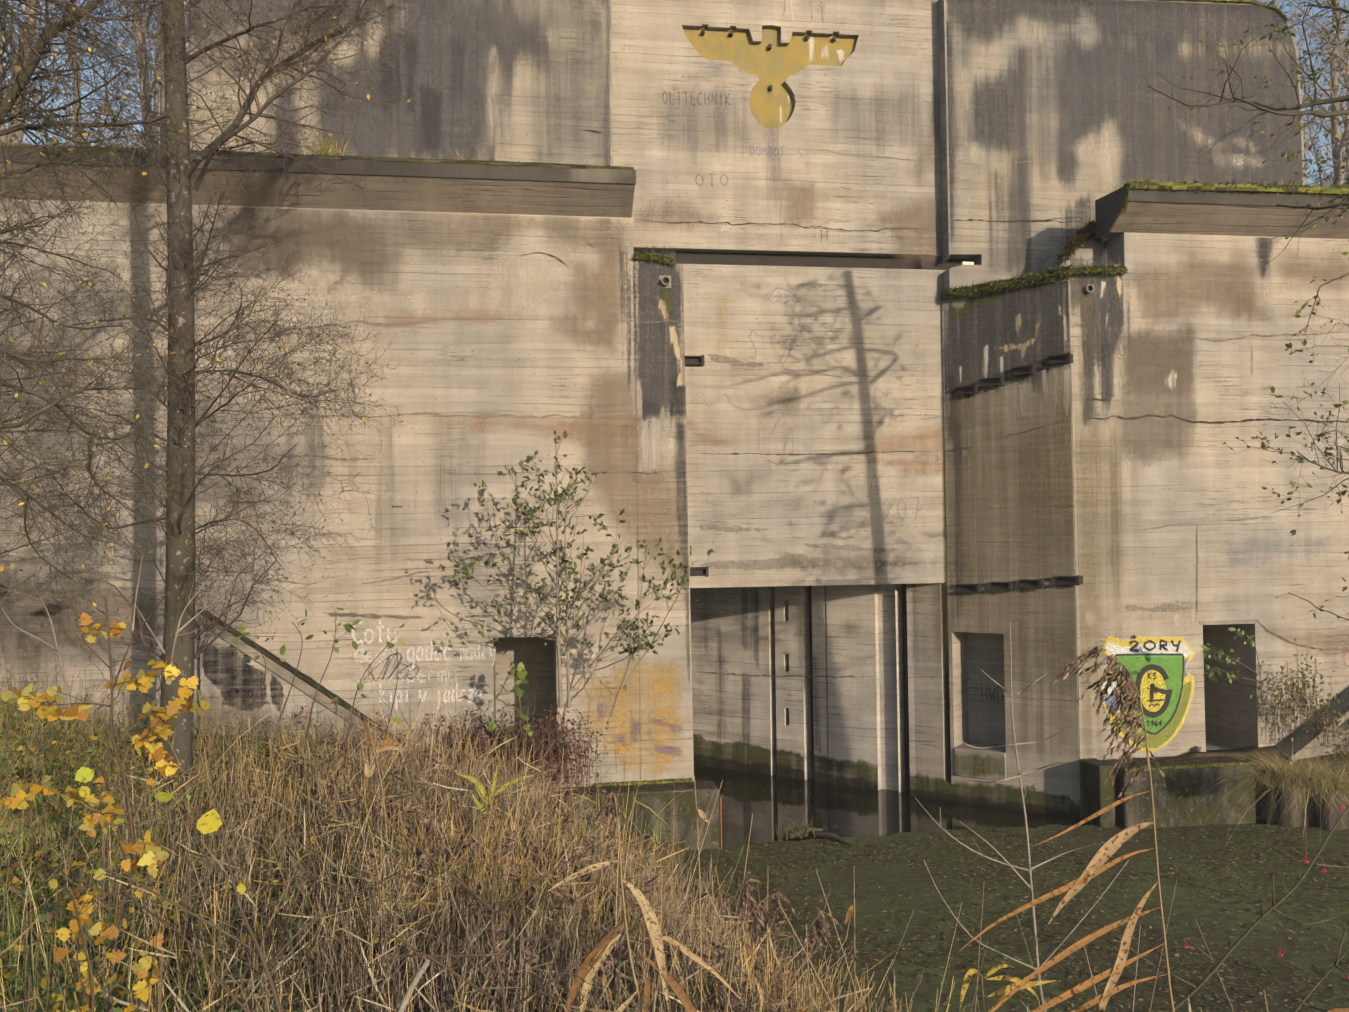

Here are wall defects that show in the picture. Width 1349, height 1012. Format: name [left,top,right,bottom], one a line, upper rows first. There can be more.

water stain [189,0,547,161]
water stain [946,0,1303,235]
water stain [943,49,1191,462]
water stain [1259,237,1272,278]
crack [705,398,1349,455]